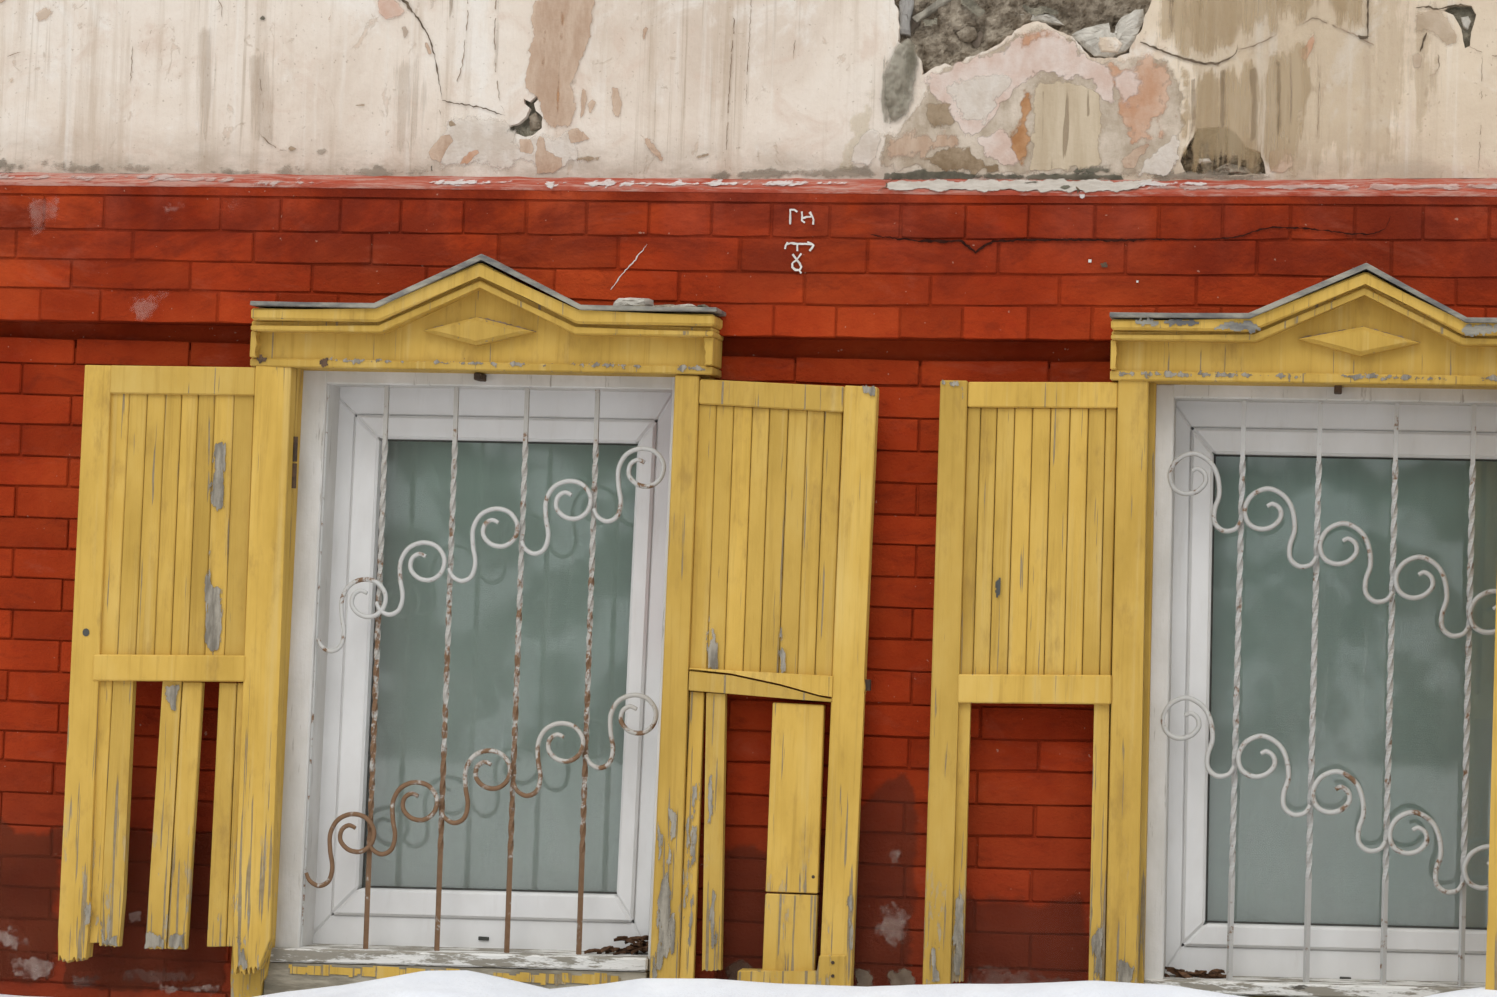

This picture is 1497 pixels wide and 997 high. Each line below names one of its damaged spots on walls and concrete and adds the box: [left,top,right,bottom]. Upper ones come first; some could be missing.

crack [402,0,504,115]
peeling [429,0,622,188]
peeling [852,0,1497,198]
peeling [645,138,663,161]
peeling [585,179,847,188]
peeling [205,551,223,651]
peeling [165,685,179,711]
peeling [84,902,117,946]
peeling [144,931,186,950]
peeling [236,937,248,970]